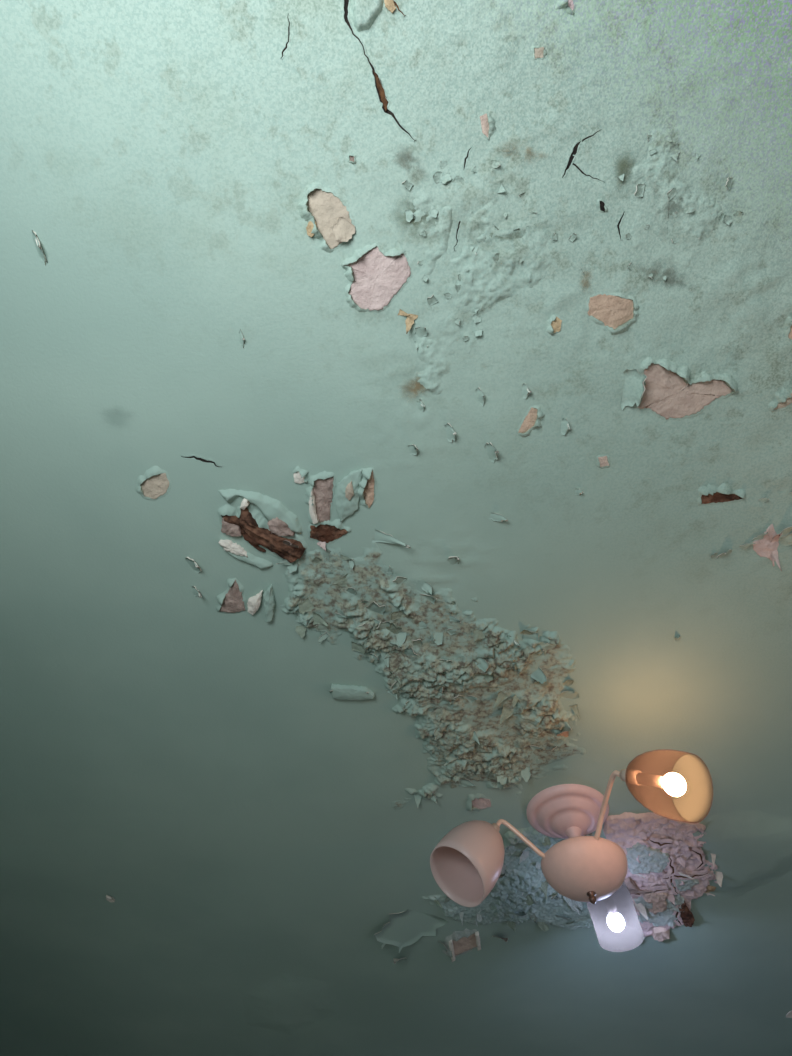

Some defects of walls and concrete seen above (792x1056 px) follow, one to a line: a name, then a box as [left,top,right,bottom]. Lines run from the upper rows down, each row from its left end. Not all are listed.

crack [342,0,416,142]
spalling [478,112,496,141]
crack [561,128,605,183]
peeling [297,152,577,412]
spalling [586,292,640,335]
spalling [620,357,739,422]
crack [181,454,222,469]
peeling [711,524,792,571]
peeling [216,466,586,812]
peeling [374,826,594,964]
spalling [585,812,723,942]